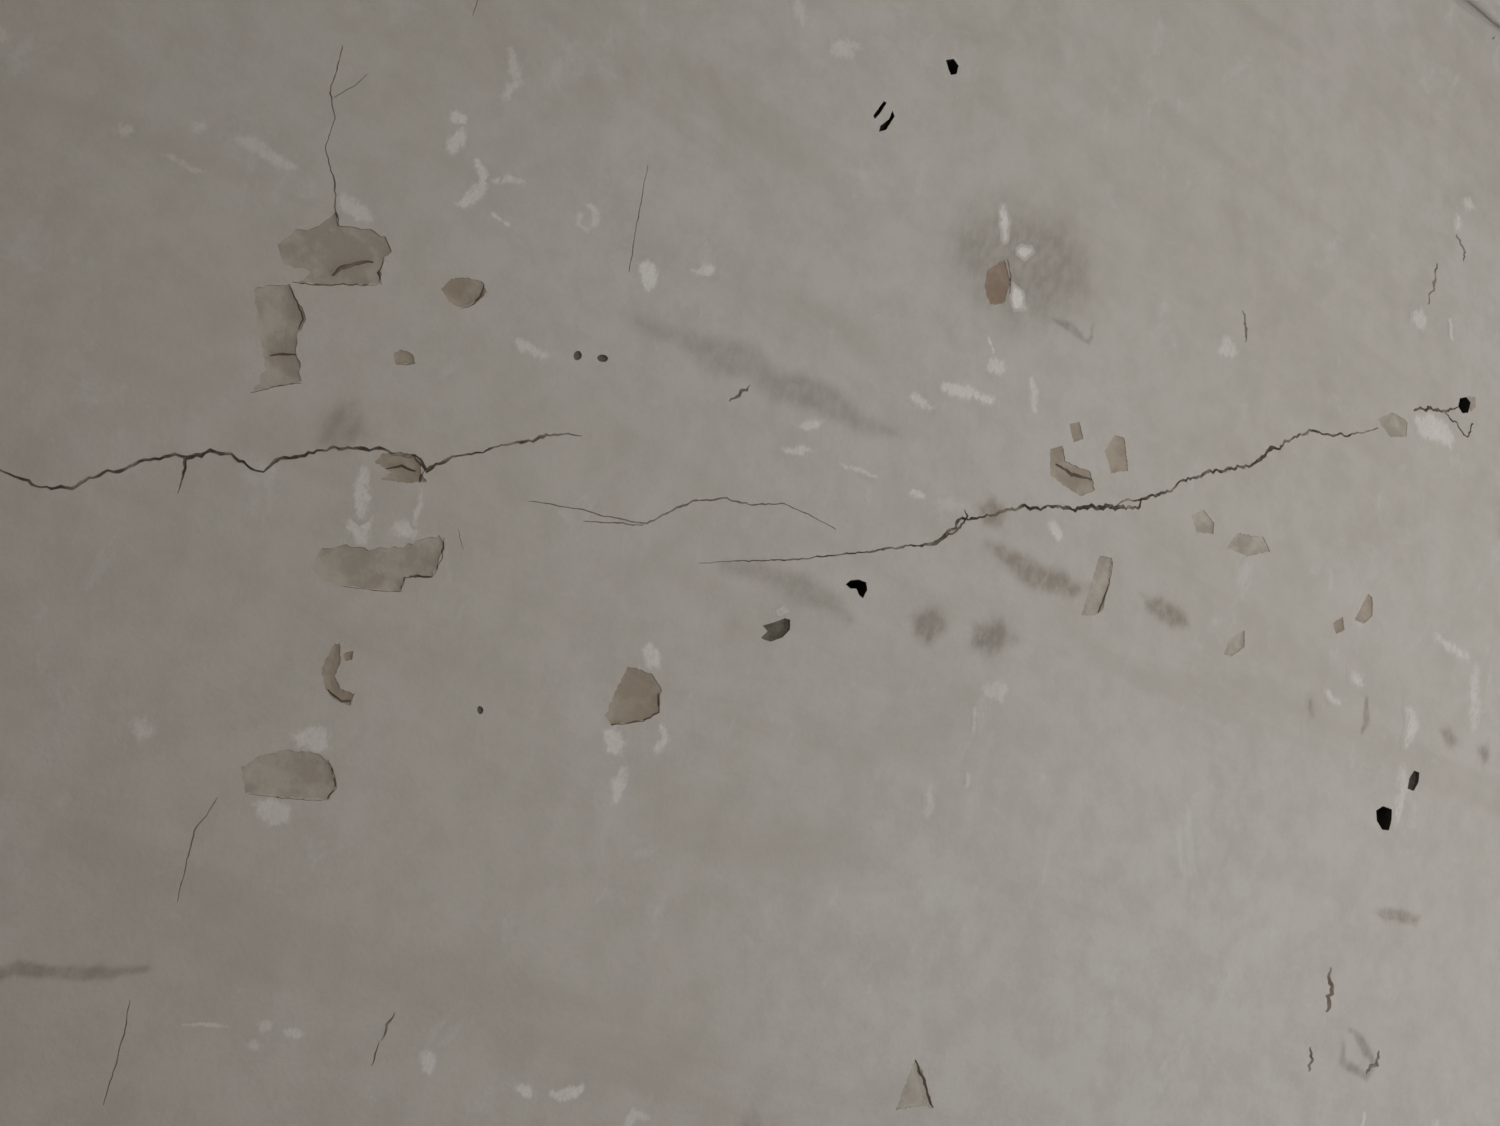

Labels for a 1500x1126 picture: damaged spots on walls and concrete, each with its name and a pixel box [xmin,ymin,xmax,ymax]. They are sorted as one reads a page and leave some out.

crack [325,45,368,226]
flaking render [251,213,392,393]
flaking render [441,278,487,309]
crack [1414,405,1473,438]
crack [0,432,582,493]
flaking render [1050,422,1095,496]
flaking render [1104,435,1128,474]
crack [528,427,1378,564]
flaking render [313,530,462,592]
flaking render [322,643,355,705]
flaking render [605,667,662,726]
flaking render [241,750,337,801]